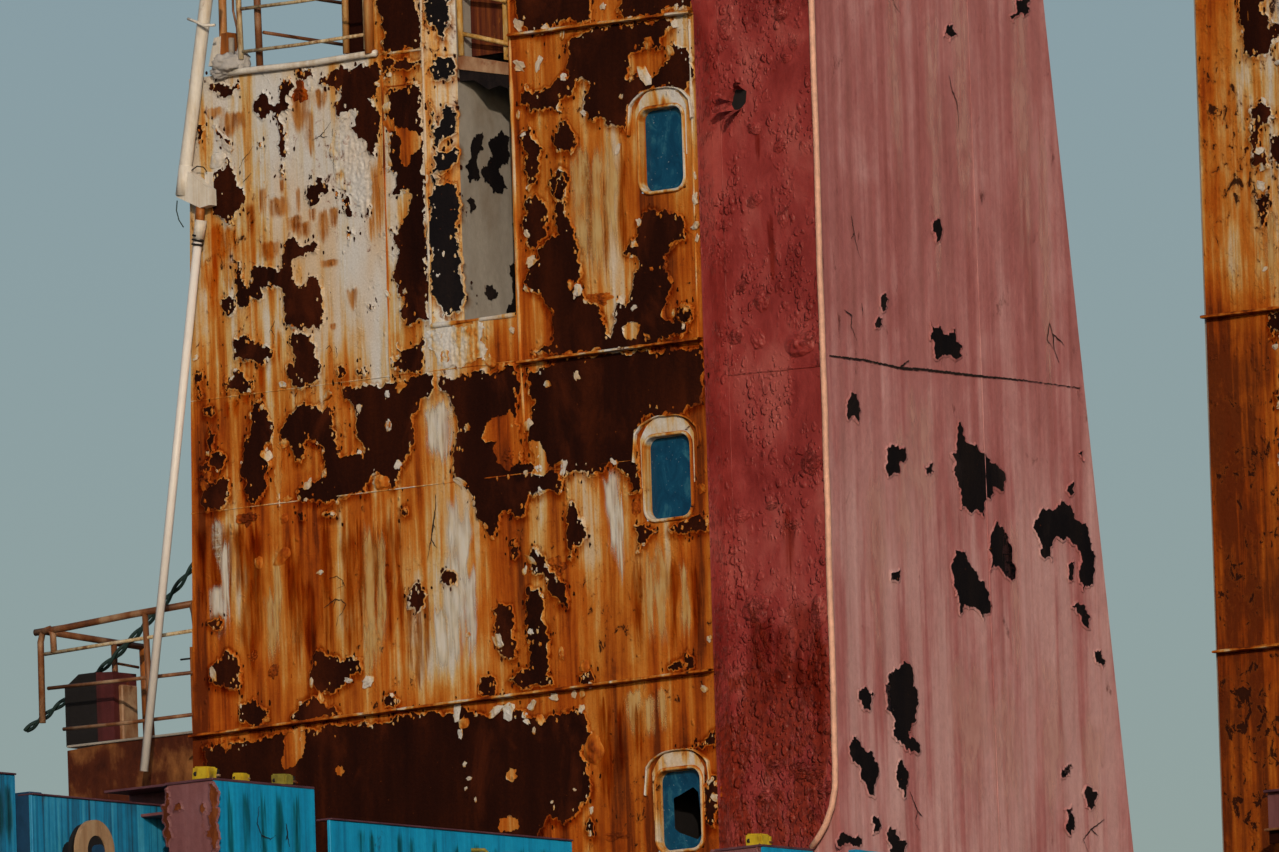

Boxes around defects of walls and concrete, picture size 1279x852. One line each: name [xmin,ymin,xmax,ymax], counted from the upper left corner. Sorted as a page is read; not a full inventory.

peeling [1227,0,1279,66]
peeling [1244,97,1279,230]
crack [829,307,1079,389]
rust [199,527,259,609]
rust [342,528,429,648]
peeling [160,0,709,852]
water stain [426,400,447,461]
water stain [434,504,476,664]
peeling [884,442,908,479]
peeling [949,420,1017,622]
peeling [1031,480,1096,631]
peeling [835,659,921,852]